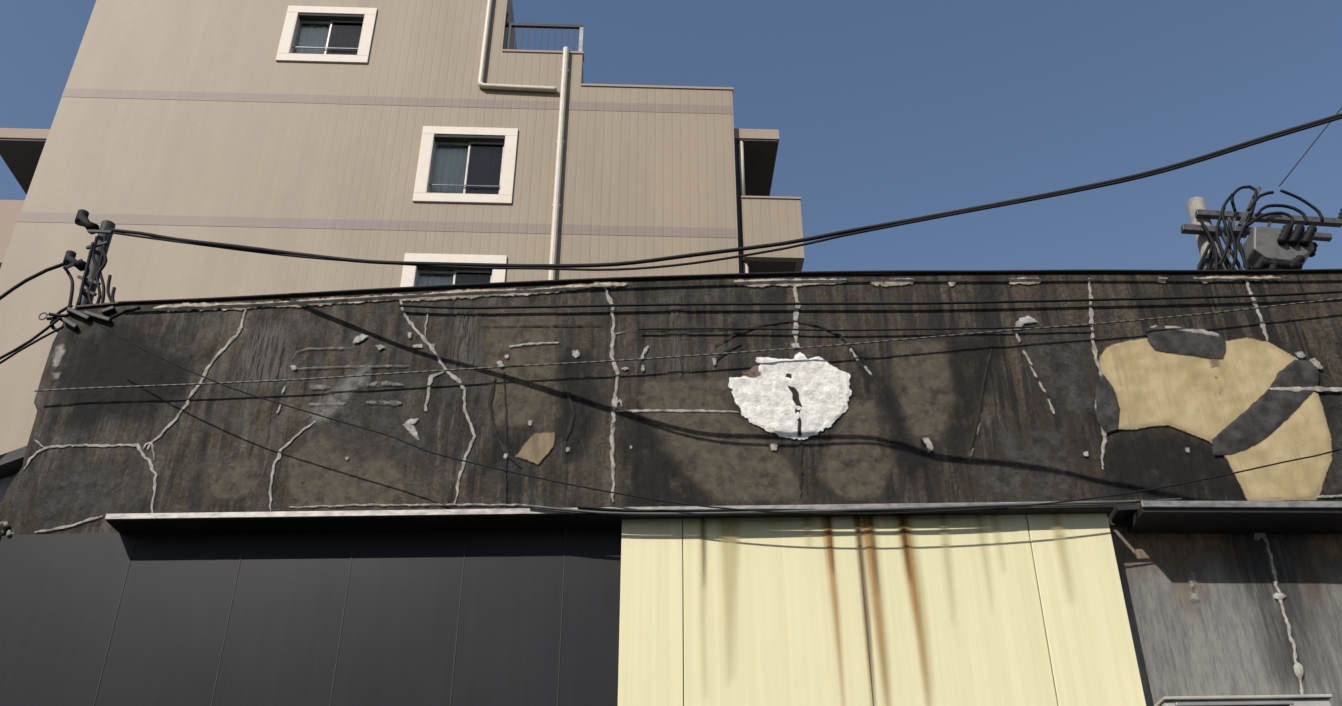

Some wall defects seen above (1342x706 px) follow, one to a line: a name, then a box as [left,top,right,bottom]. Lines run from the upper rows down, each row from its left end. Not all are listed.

damp [53,325,183,418]
crack [24,309,247,513]
crack [399,300,476,504]
crack [603,287,738,502]
peeling [785,373,802,436]
damp [865,356,924,466]
peeling [1151,325,1219,336]
peeling [1296,351,1323,369]
damp [622,418,706,507]
rust [823,516,837,616]
rust [854,515,877,672]
rust [898,515,917,617]